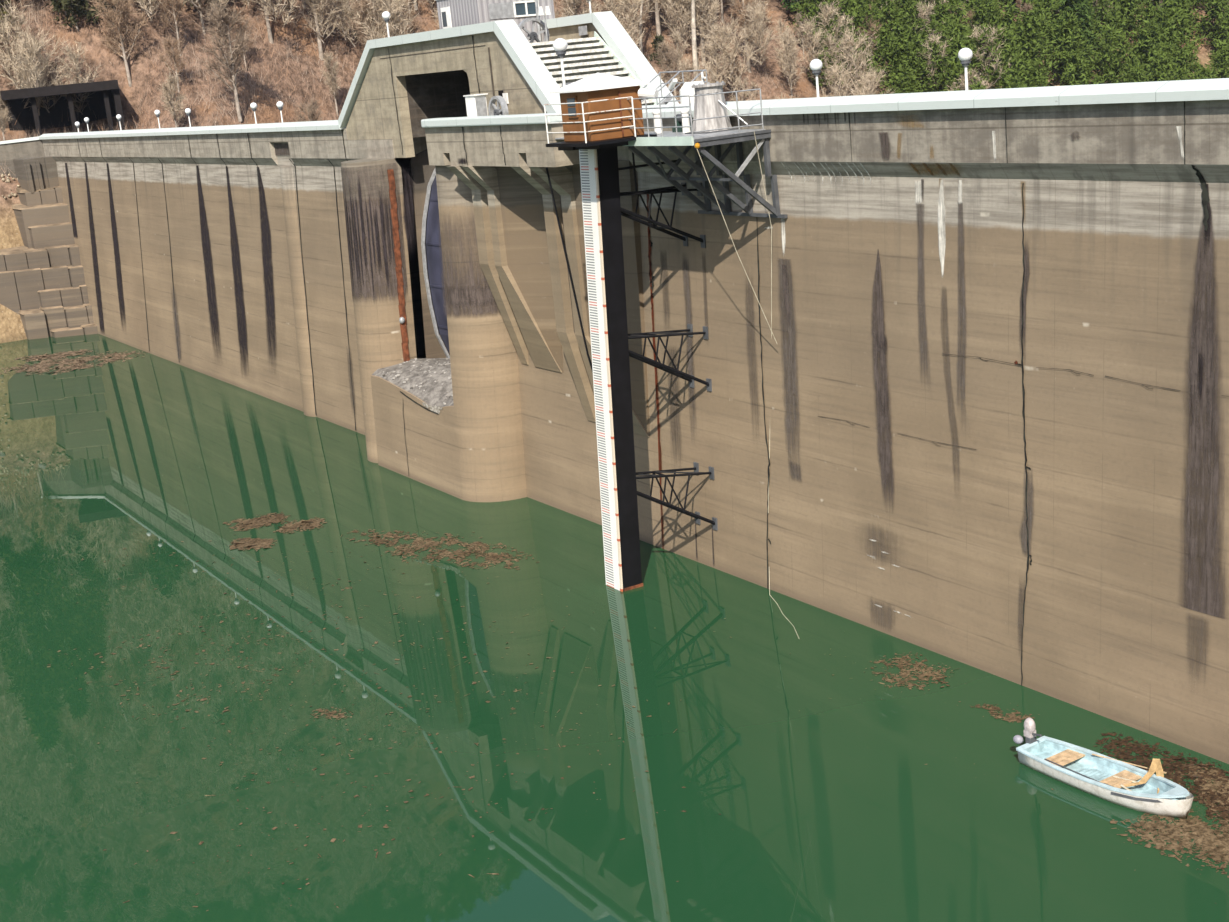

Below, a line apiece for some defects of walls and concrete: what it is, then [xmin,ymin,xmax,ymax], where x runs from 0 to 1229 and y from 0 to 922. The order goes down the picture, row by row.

damp [196,166,220,347]
damp [226,166,248,370]
damp [257,167,276,355]
damp [341,163,415,300]
damp [767,218,800,479]
damp [872,249,894,498]
damp [915,179,927,370]
damp [938,179,966,415]
crack [946,107,1181,686]
damp [1184,184,1223,652]